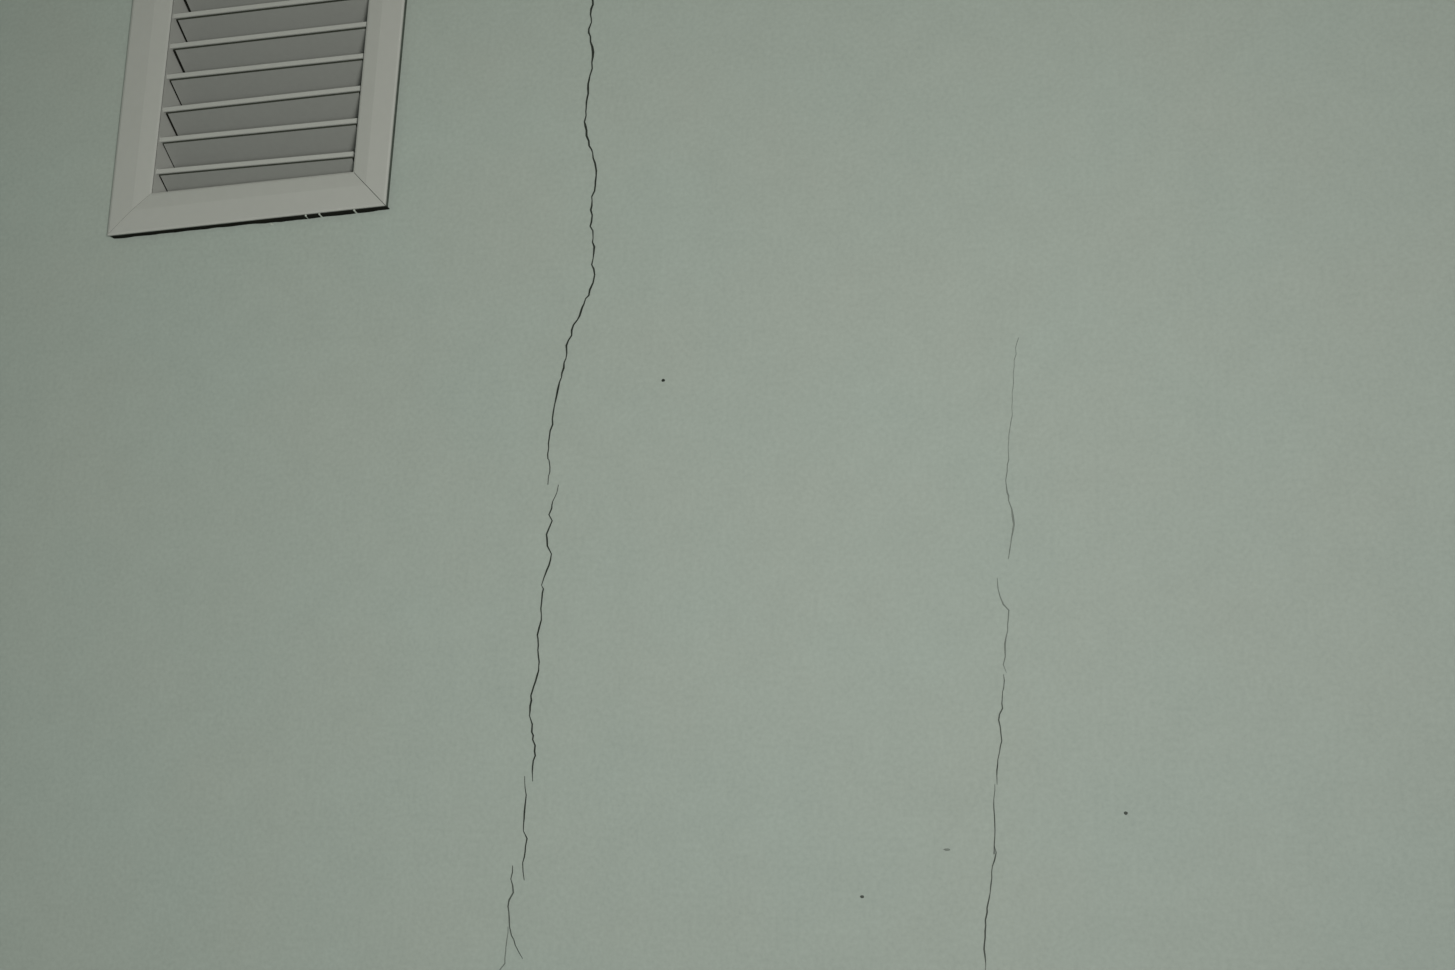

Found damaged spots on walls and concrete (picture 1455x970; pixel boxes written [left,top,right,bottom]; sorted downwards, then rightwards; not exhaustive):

crack [499,0,597,970]
crack [983,337,1019,970]